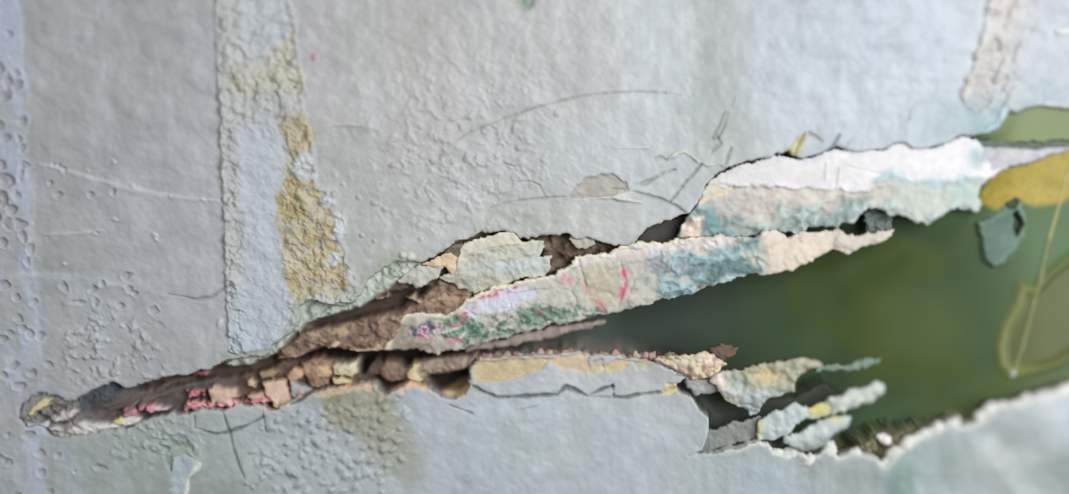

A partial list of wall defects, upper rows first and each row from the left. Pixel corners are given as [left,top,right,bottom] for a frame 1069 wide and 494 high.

peeling [504,0,538,15]
peeling [958,0,1069,137]
peeling [784,133,806,157]
peeling [215,0,360,355]
peeling [397,231,552,294]
peeling [569,236,596,249]
peeling [57,270,141,312]
peeling [317,381,374,398]
peeling [396,379,429,394]
peeling [442,346,885,452]